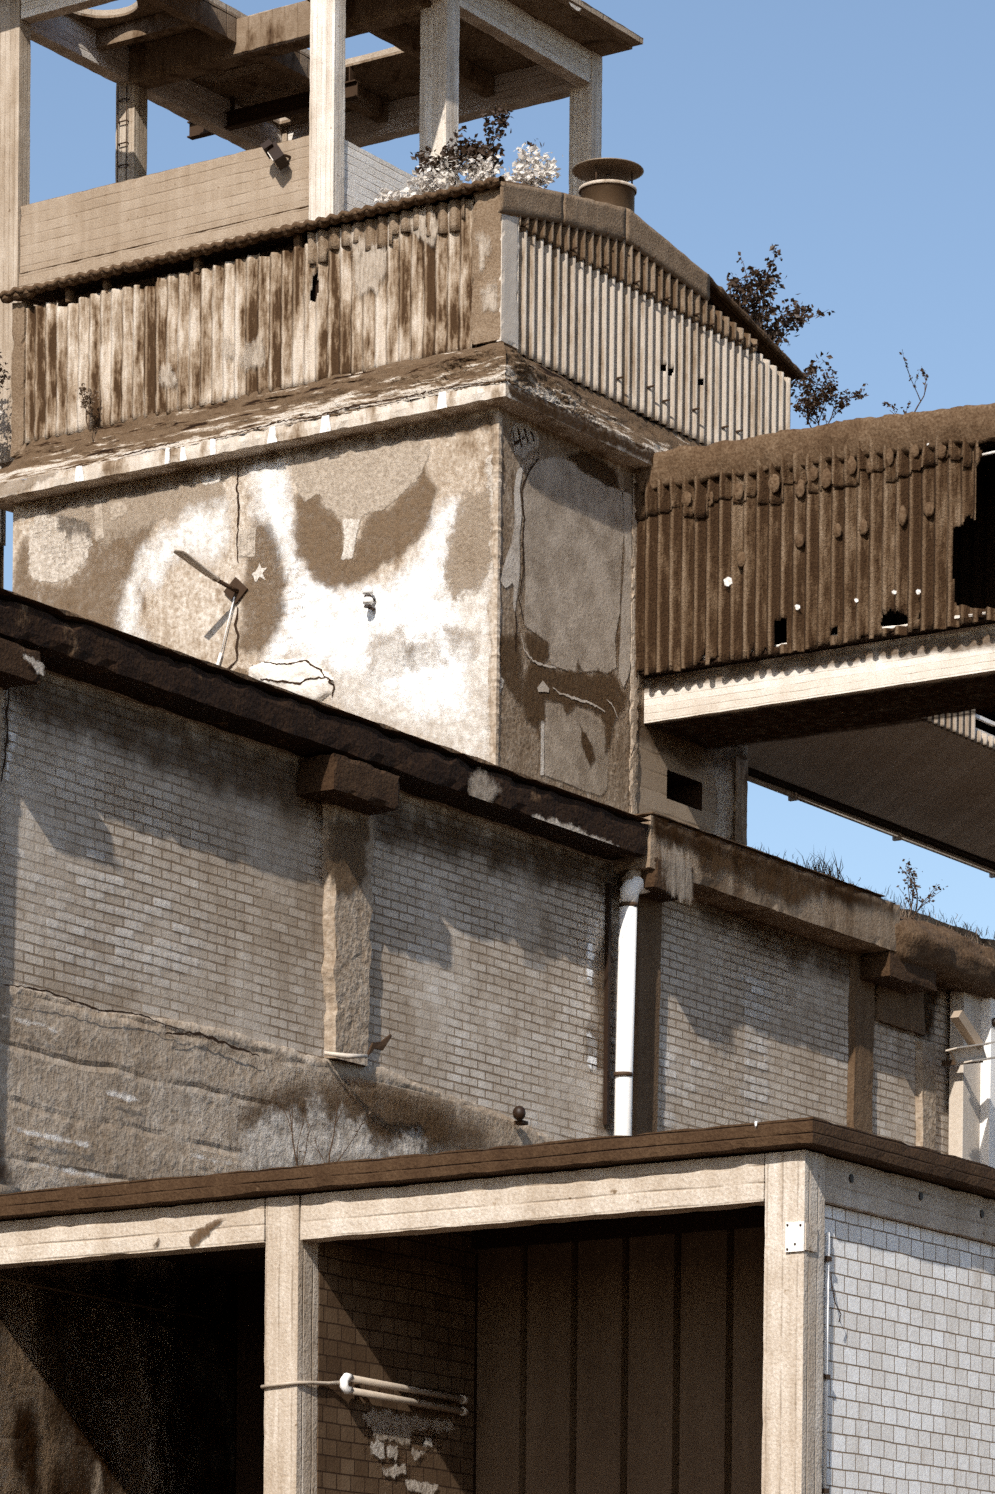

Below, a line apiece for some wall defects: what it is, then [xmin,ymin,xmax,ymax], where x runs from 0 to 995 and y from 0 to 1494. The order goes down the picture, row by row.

flaking render [485,454,493,511]
flaking render [487,422,632,687]
crack [227,607,239,669]
leakage [0,384,995,976]
crack [1,688,10,781]
flaking render [540,703,608,795]
crack [3,984,259,1056]
leakage [239,1077,485,1171]
leakage [0,1271,63,1494]
peeling [362,1409,454,1494]